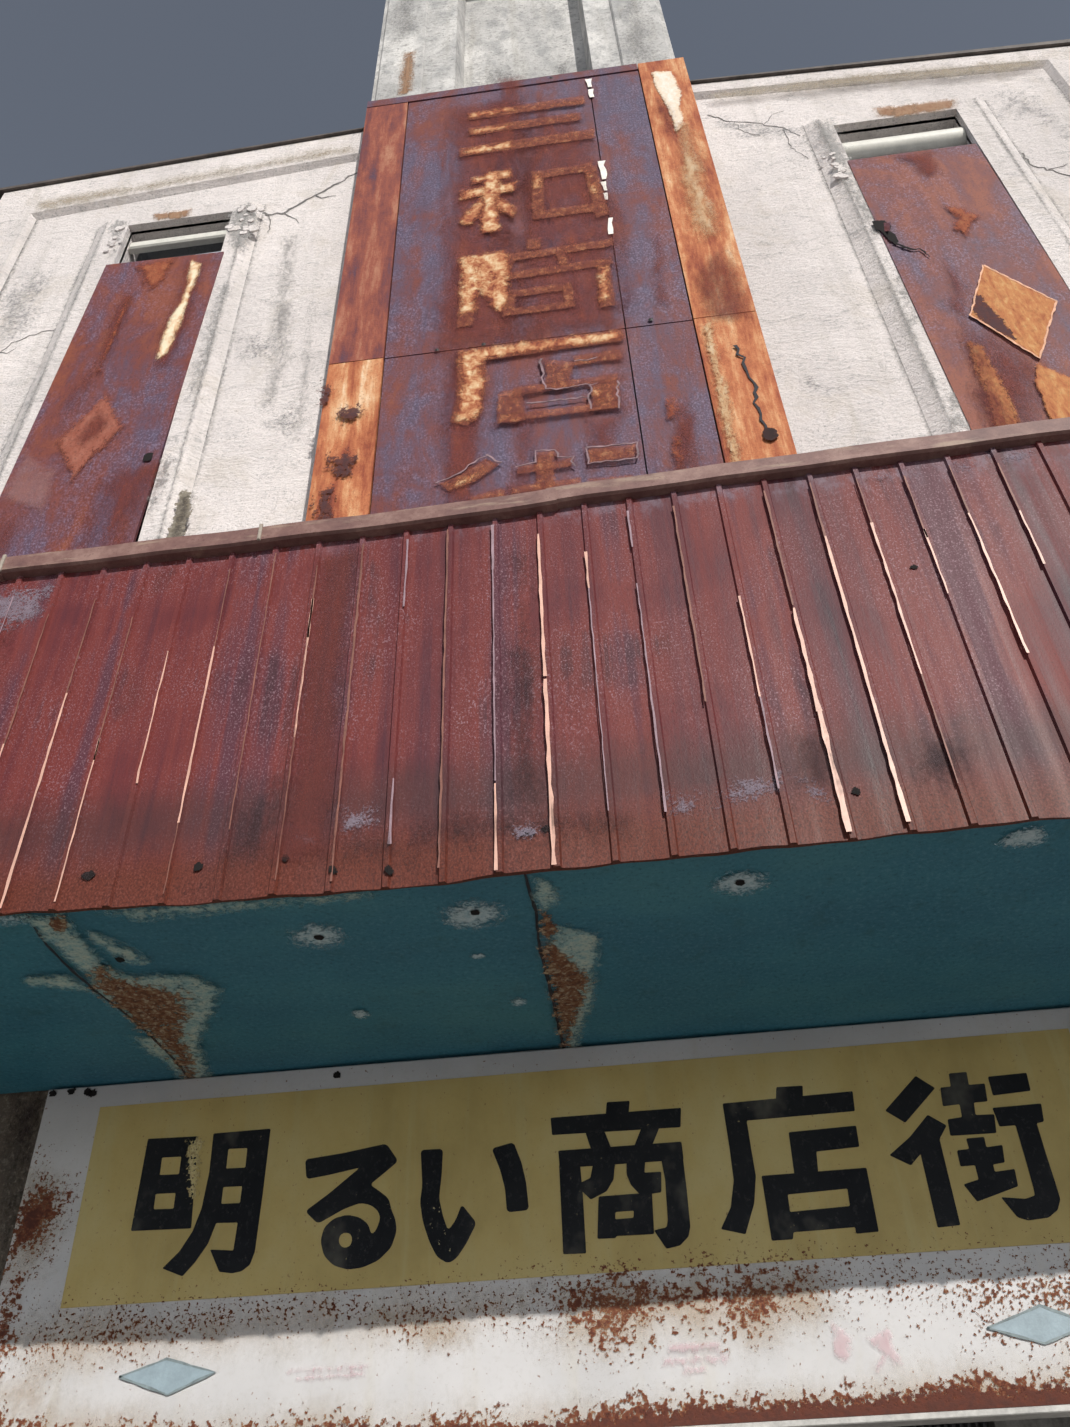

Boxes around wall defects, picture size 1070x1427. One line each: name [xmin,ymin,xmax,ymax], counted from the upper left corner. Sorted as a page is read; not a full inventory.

crack [263,172,357,232]
crack [0,330,54,354]
rust [135,260,201,364]
rust [968,341,1020,426]
rust [1034,363,1070,419]
rust [996,826,1048,847]